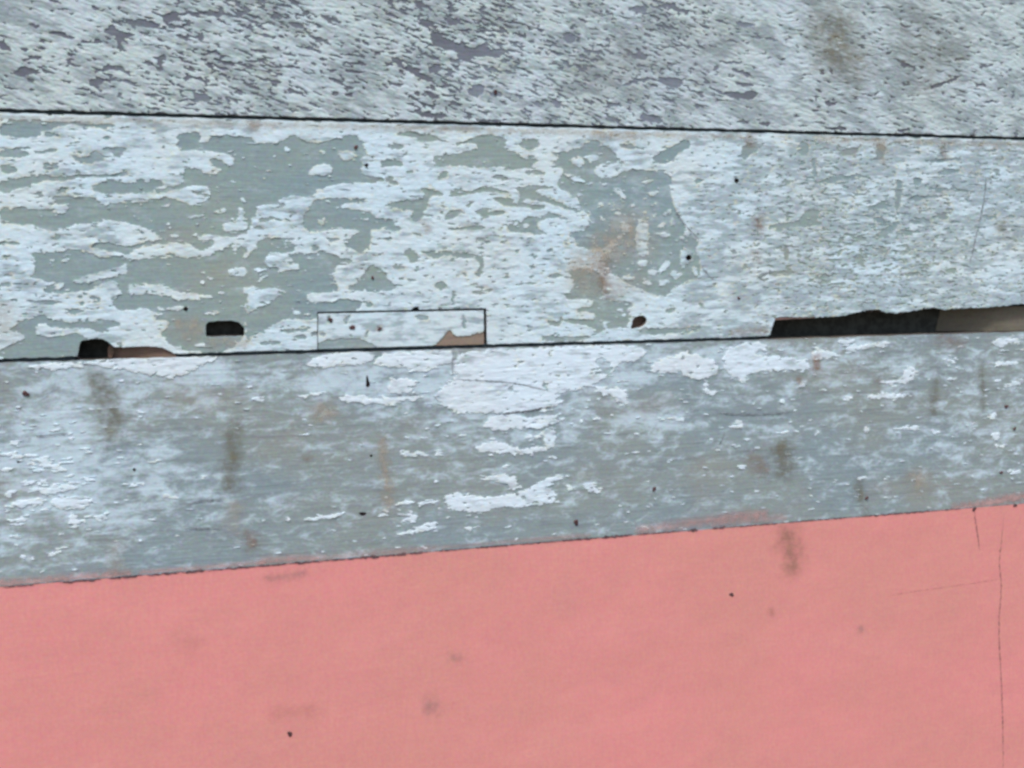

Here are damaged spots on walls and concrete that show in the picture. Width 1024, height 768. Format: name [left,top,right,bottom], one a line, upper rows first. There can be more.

peeling [0,0,1024,560]
crack [62,508,1004,765]